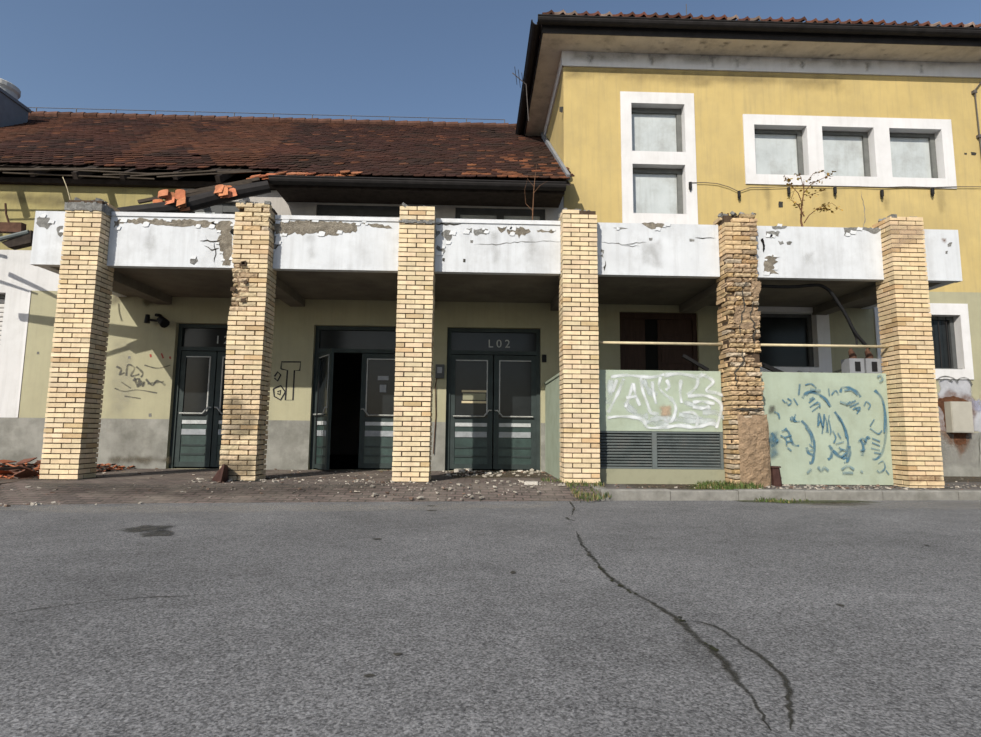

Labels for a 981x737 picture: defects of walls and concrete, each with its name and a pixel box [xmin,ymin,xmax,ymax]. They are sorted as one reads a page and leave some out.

spalling [238,199,391,251]
spalling [435,226,556,262]
spalling [729,224,792,332]
flaking render [936,393,974,452]
crack [566,502,624,586]
crack [643,598,795,731]